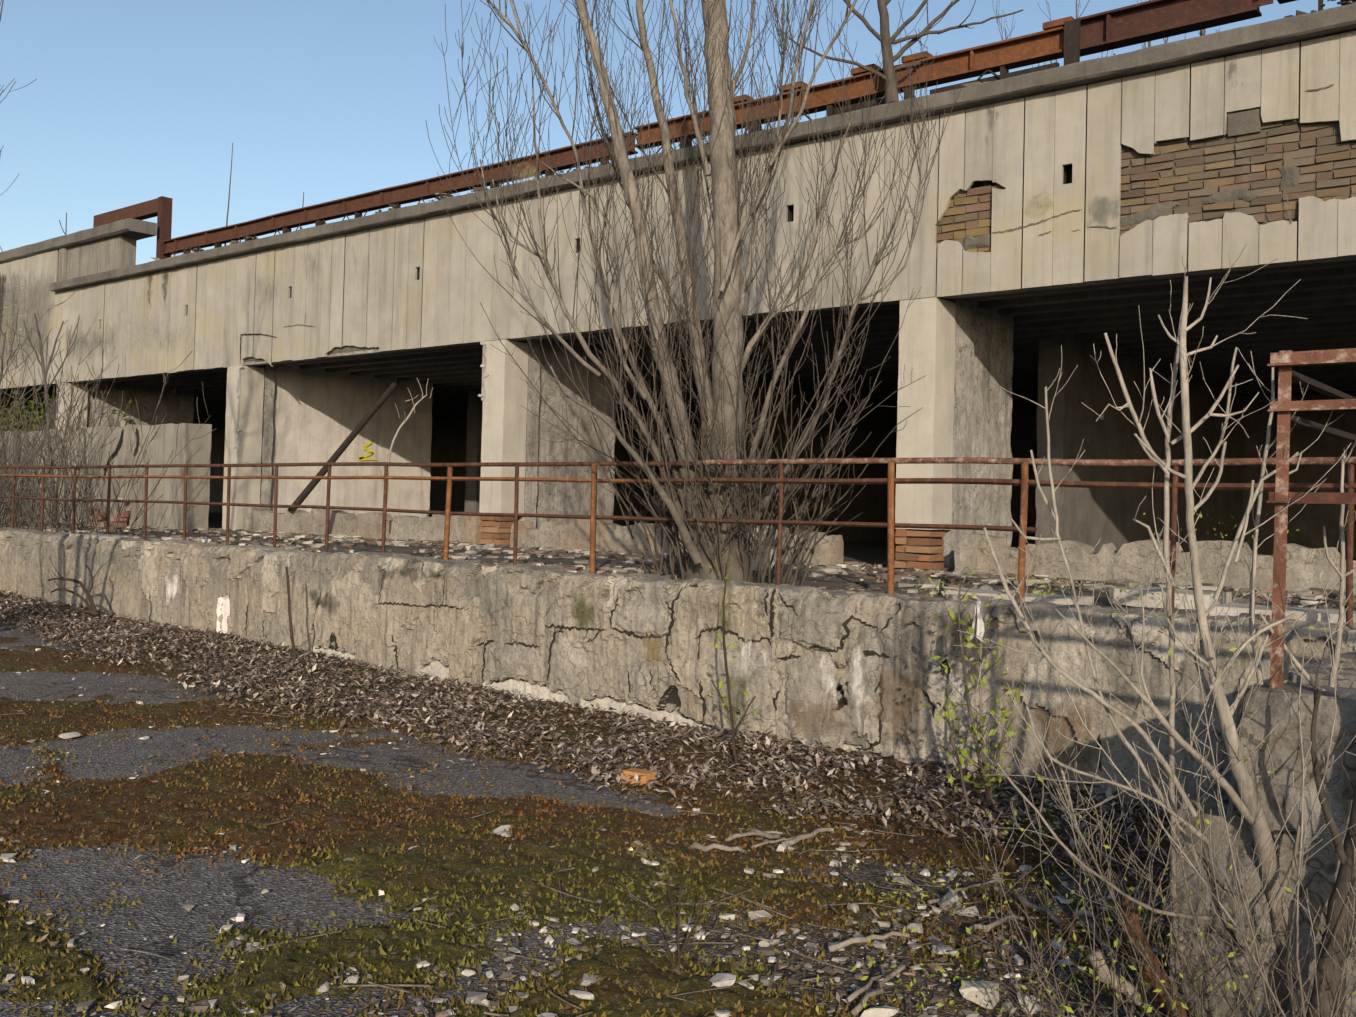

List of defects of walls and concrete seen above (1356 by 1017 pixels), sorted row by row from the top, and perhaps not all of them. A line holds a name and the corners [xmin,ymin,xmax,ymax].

flaking render [1120,82,1356,240]
flaking render [936,185,1006,262]
crack [374,570,469,668]
crack [476,588,900,751]
crack [921,688,935,718]